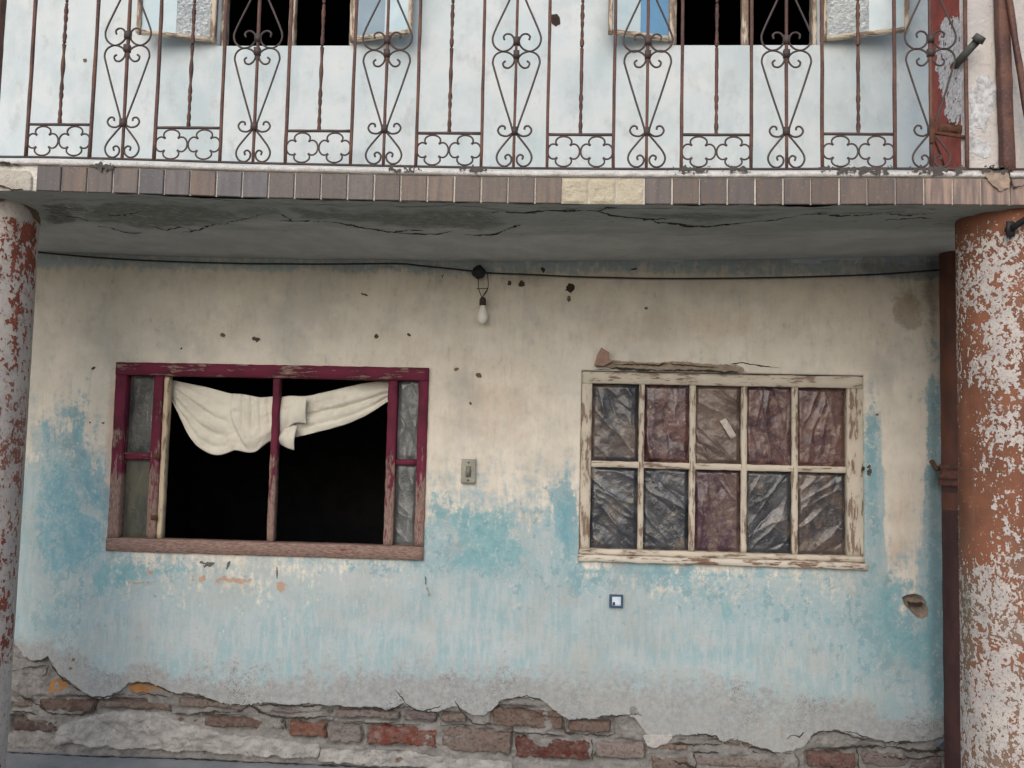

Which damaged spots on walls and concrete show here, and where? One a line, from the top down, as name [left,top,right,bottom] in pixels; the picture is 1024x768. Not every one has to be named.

flaking render [0,216,944,768]
crack [67,207,932,236]
peeling [935,13,964,125]
peeling [955,220,1024,768]